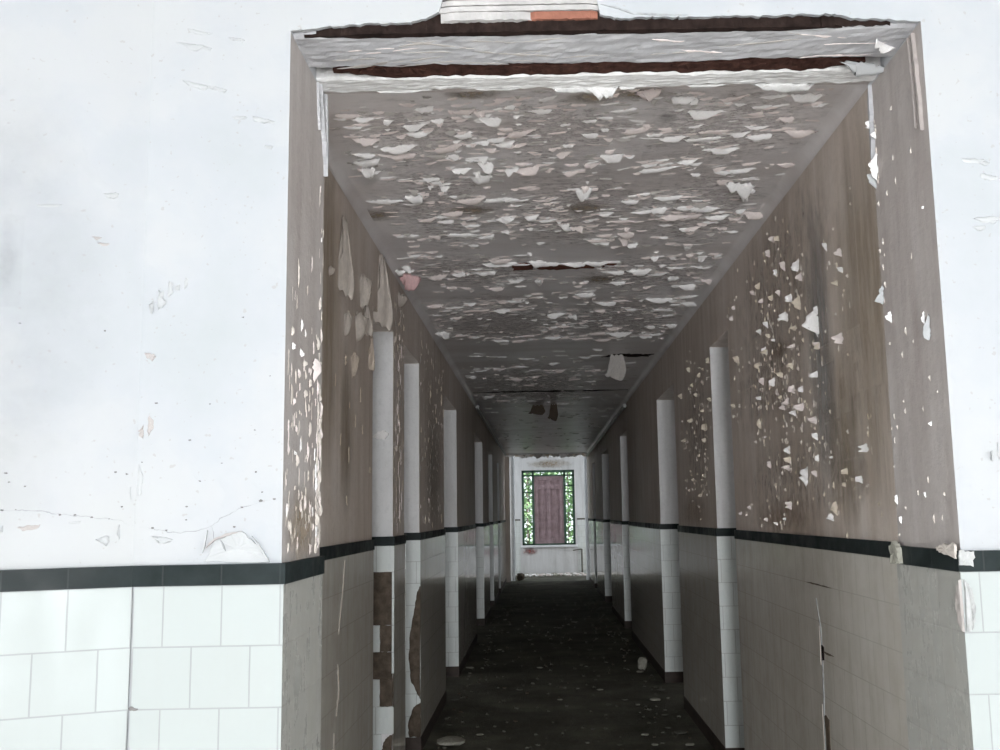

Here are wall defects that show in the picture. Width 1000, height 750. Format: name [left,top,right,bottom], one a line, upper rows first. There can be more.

peeling [334,37,566,69]
peeling [651,33,896,206]
peeling [292,82,851,533]
peeling [875,282,892,323]
peeling [904,312,931,343]
crack [0,498,275,538]
peeling [285,298,323,555]
peeling [813,468,870,521]
peeling [858,414,873,454]
spalling [373,572,393,707]
spalling [408,587,421,737]
crack [807,582,834,750]